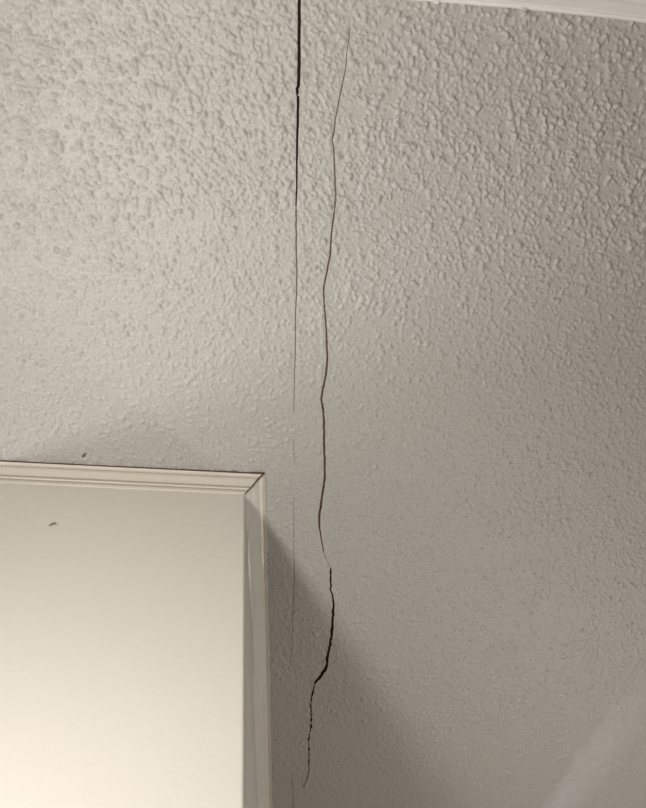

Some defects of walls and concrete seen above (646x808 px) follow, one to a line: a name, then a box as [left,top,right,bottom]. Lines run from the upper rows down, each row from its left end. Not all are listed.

crack [288,510,296,663]
crack [292,0,350,808]